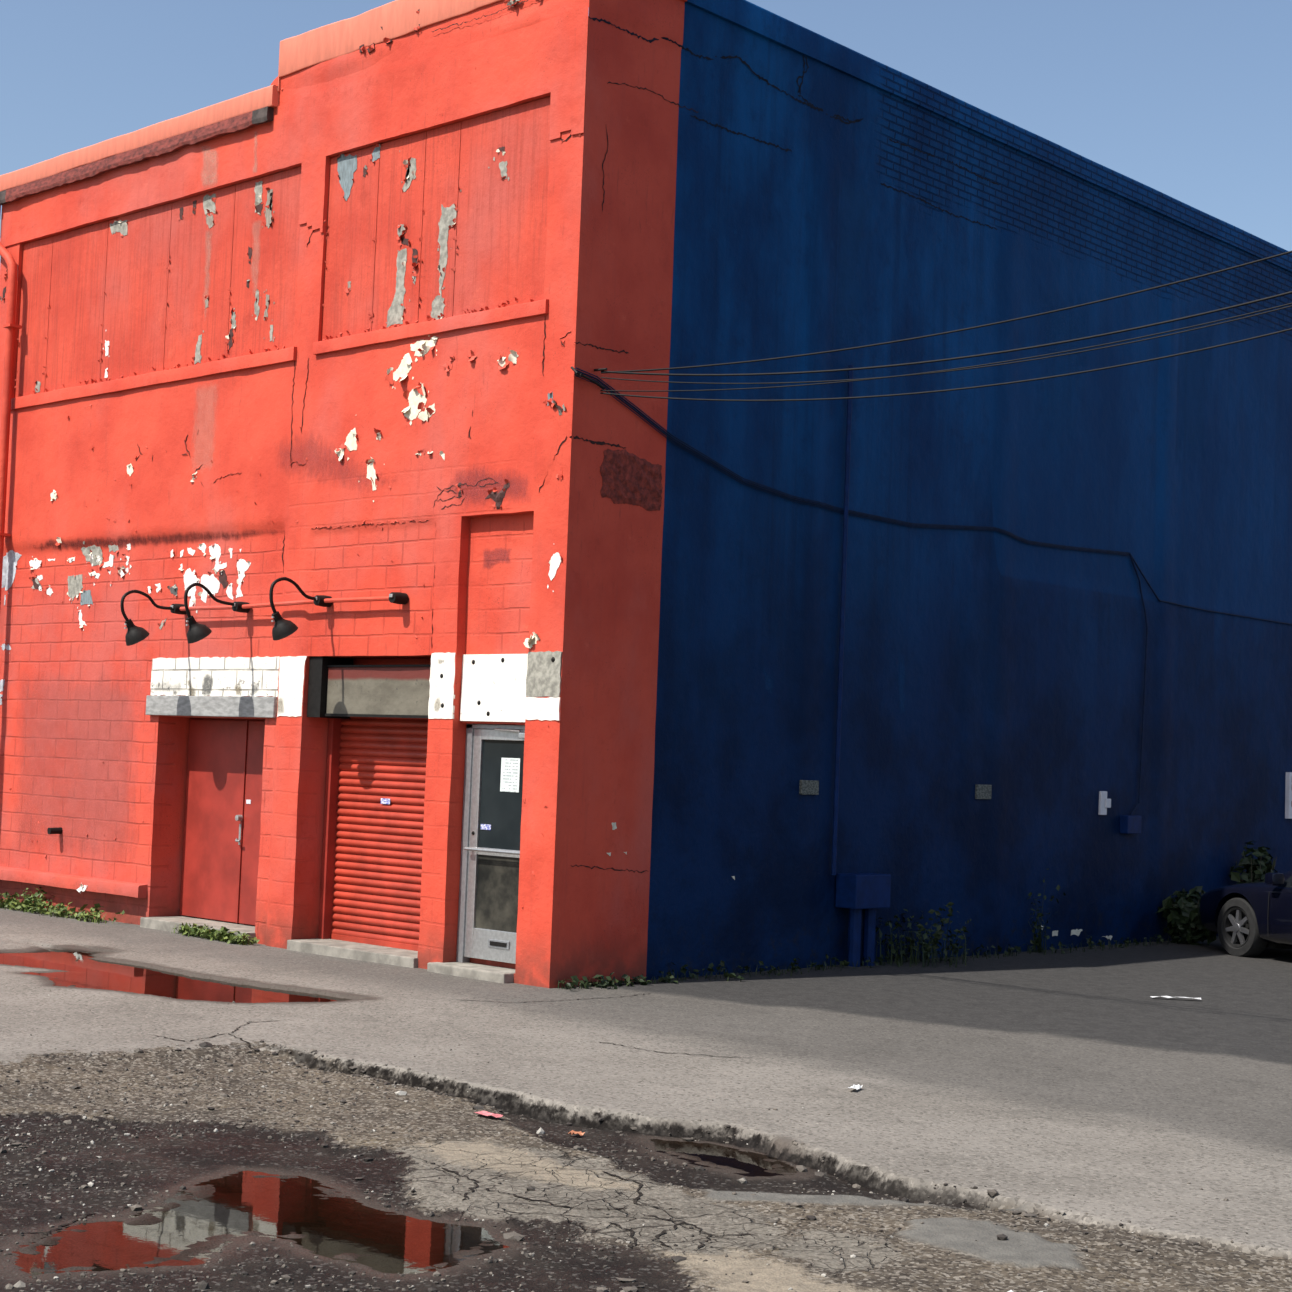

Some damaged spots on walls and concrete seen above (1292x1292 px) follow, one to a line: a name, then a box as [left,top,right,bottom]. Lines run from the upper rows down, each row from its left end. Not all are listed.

crack [433,0,528,32]
crack [589,17,863,124]
crack [607,81,791,152]
peeling [337,143,381,201]
crack [560,129,608,211]
crack [881,183,997,230]
crack [889,139,999,185]
peeling [152,280,285,370]
peeling [323,187,477,425]
peeling [334,428,391,502]
peeling [2,518,136,631]
peeling [145,543,251,613]